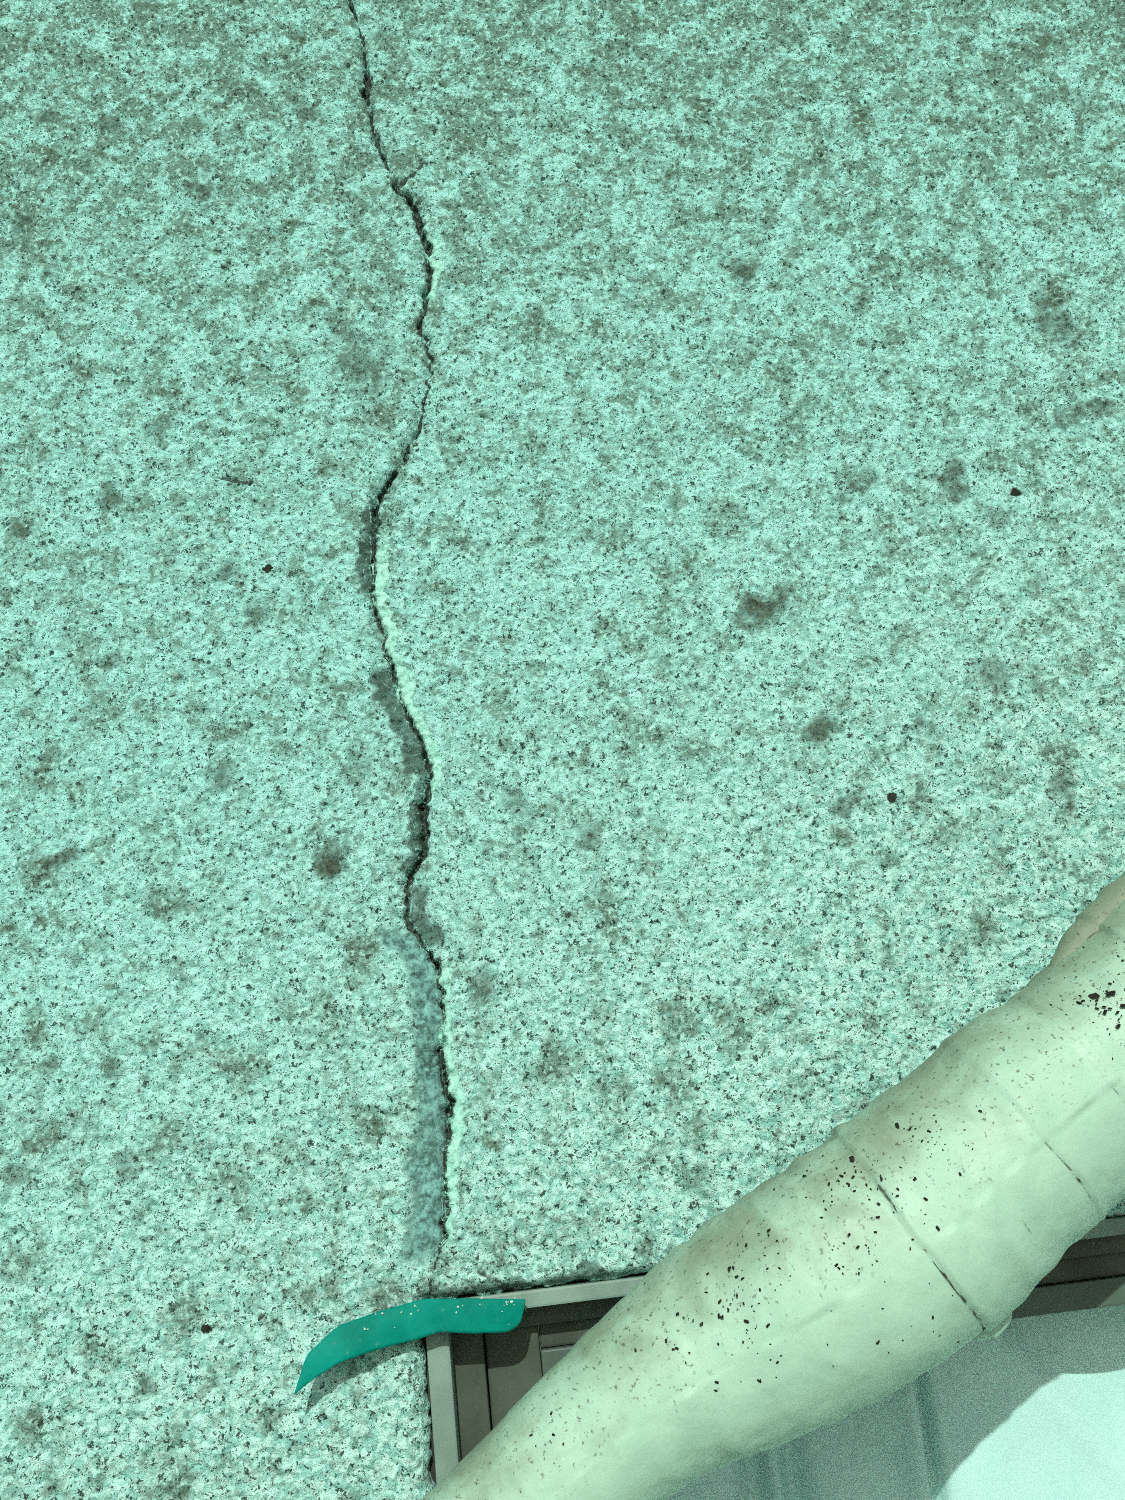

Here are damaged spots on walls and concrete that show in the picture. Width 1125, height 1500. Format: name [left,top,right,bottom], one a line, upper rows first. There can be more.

crack [348,0,518,1295]